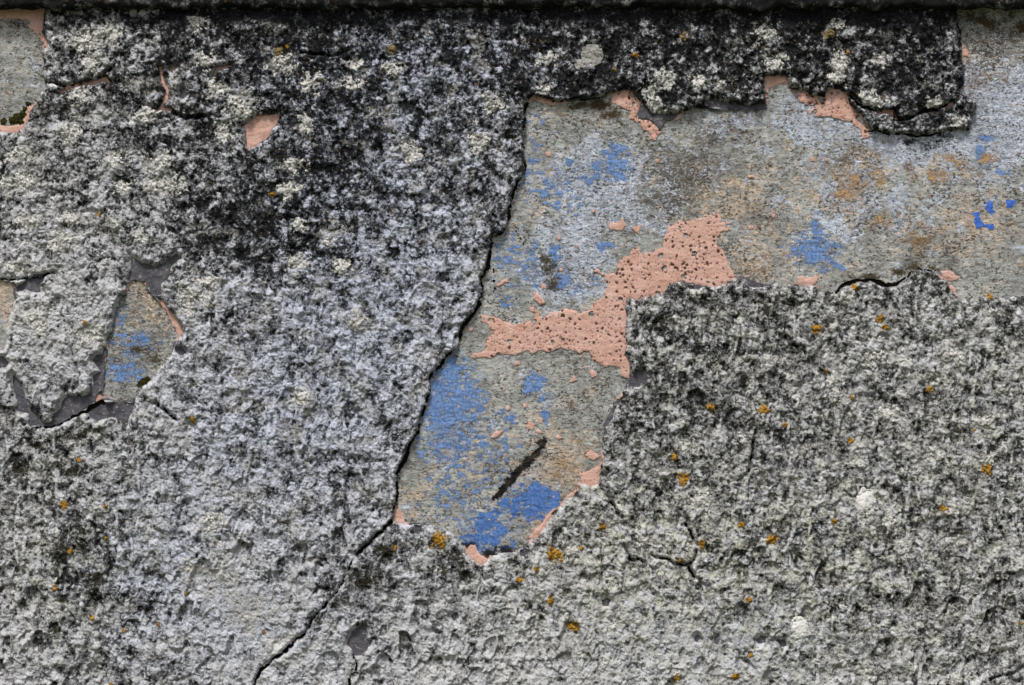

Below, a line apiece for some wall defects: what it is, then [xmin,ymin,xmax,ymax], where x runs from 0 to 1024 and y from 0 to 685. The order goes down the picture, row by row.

flaking render [0,8,111,133]
peeling [242,113,279,150]
flaking render [0,254,186,429]
crack [254,96,603,685]
flaking render [389,8,1024,570]
crack [835,268,936,294]